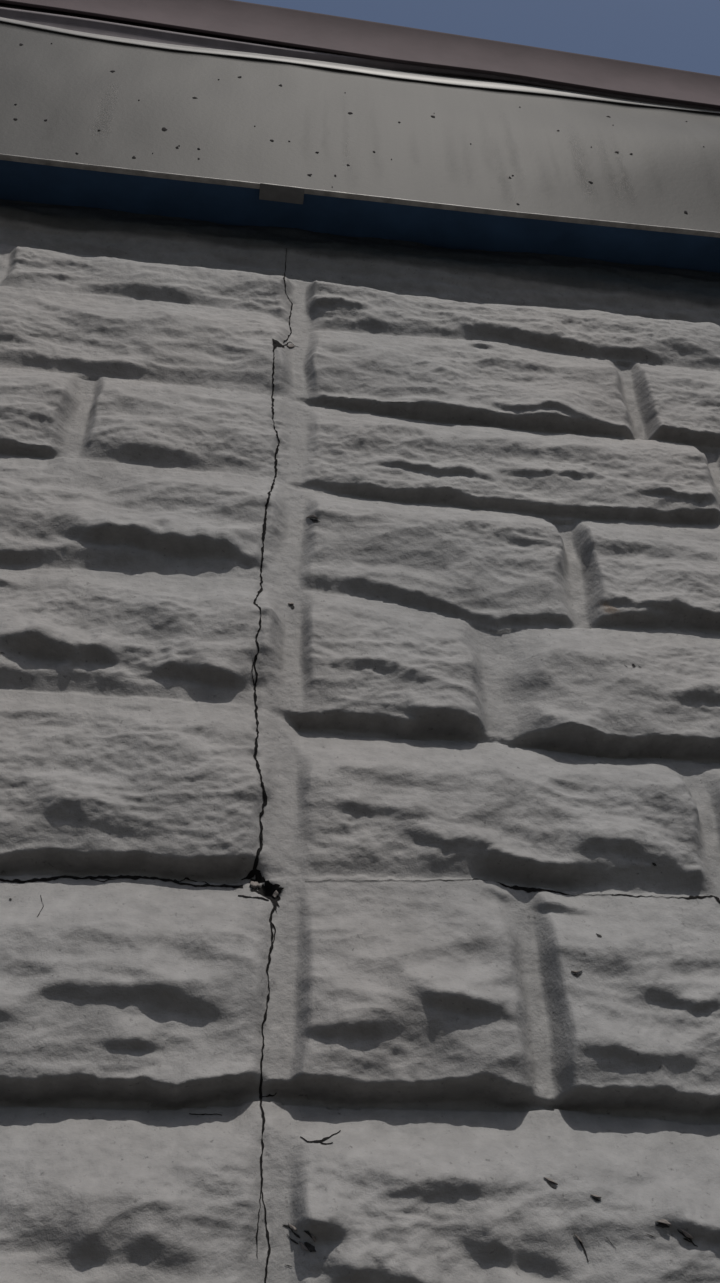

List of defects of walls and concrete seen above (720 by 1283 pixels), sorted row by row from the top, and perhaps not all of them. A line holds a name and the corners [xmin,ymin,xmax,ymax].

crack [0,249,293,888]
crack [305,878,720,904]
crack [256,906,276,1283]
crack [300,1130,341,1144]